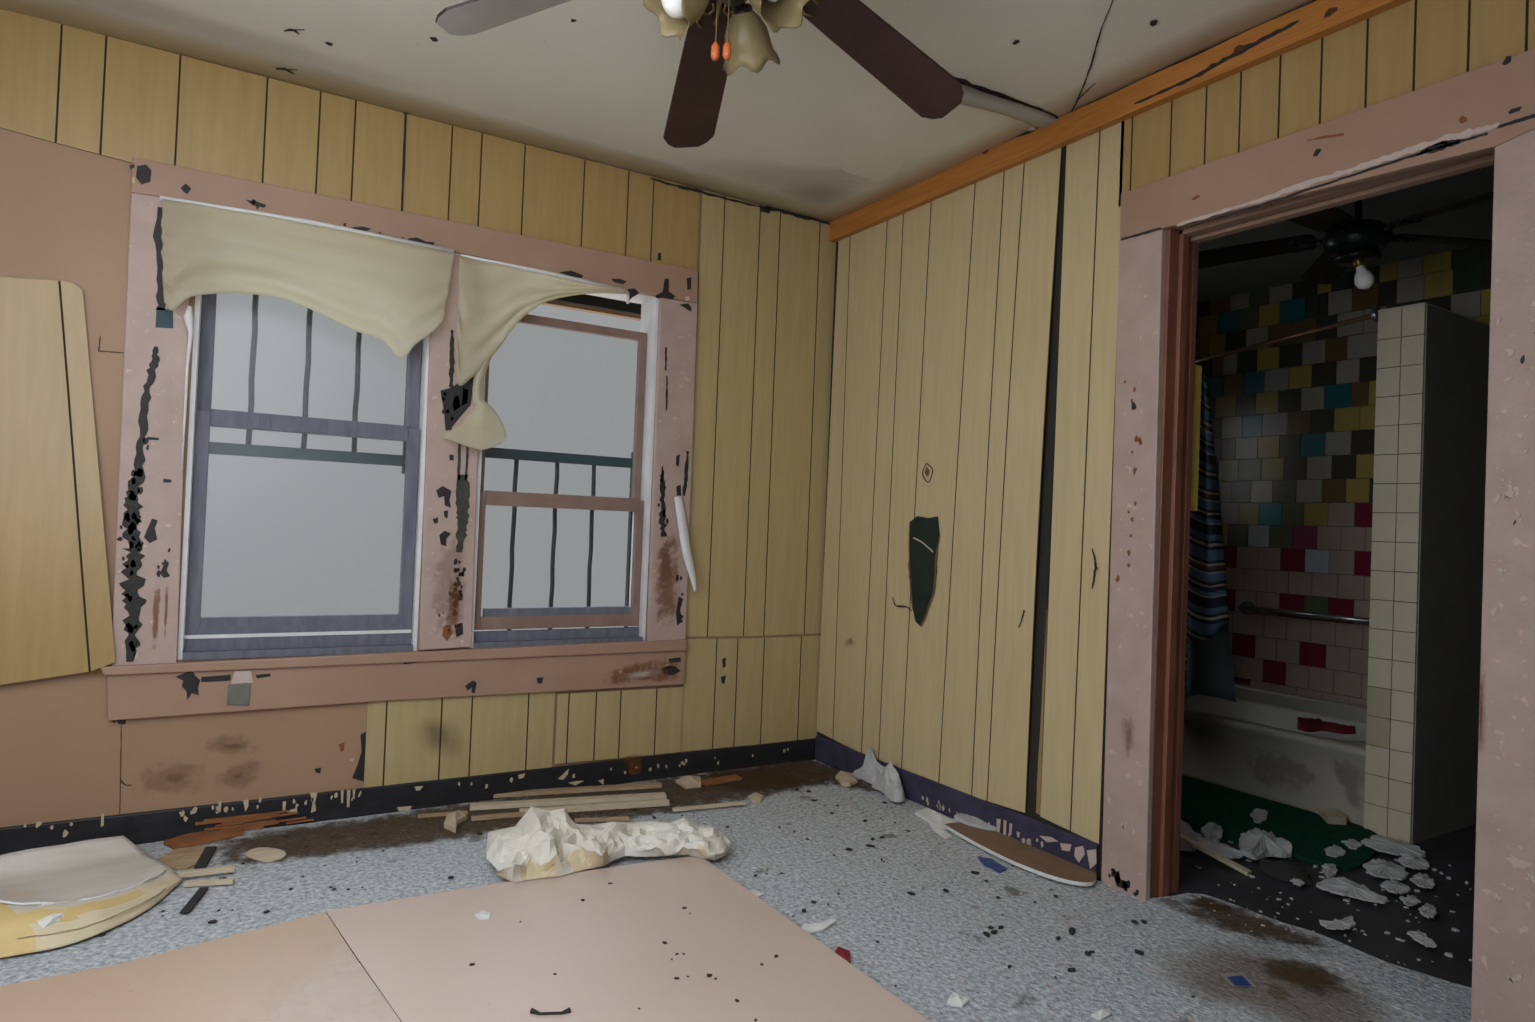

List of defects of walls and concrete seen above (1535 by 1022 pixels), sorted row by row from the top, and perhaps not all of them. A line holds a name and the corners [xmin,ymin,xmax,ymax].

crack [1071,0,1113,112]
crack [1134,20,1299,104]
peeling [1307,133,1344,156]
peeling [153,207,173,328]
peeling [117,346,171,662]
peeling [433,330,473,644]
hole [892,516,940,627]
peeling [179,797,262,822]